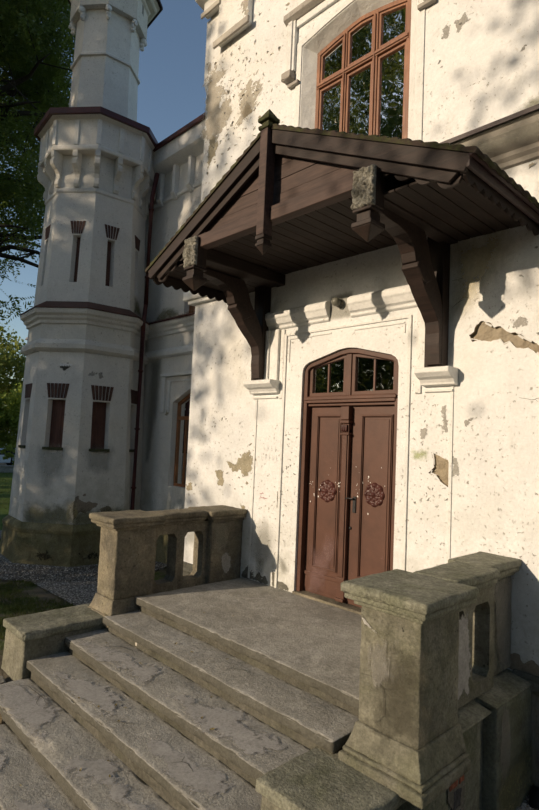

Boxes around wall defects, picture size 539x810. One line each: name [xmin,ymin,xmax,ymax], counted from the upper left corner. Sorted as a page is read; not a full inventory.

peeling [441,12,470,39]
peeling [201,35,281,175]
spalling [469,316,539,356]
peeling [215,435,256,509]
spalling [419,452,460,487]
peeling [73,494,112,520]
spalling [241,566,288,591]